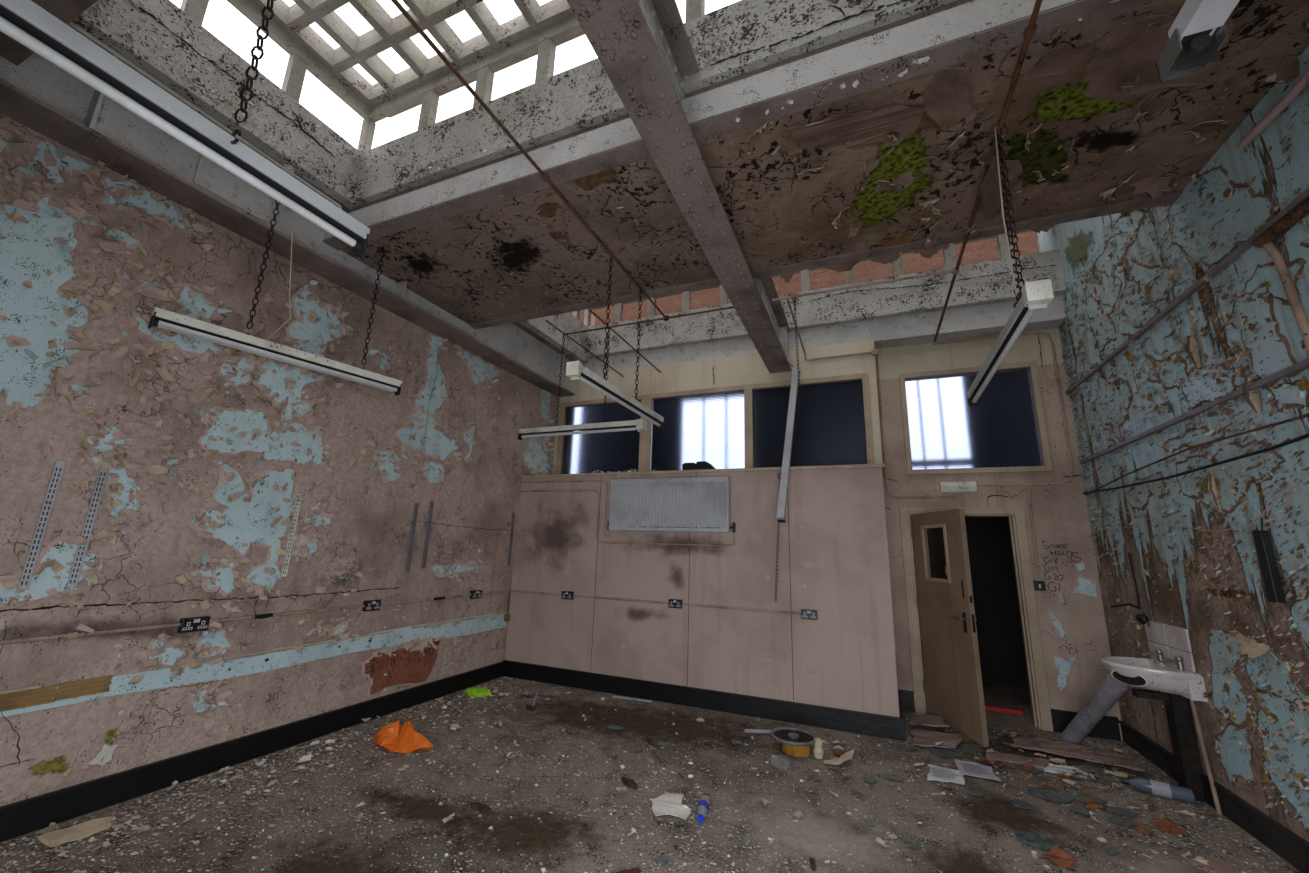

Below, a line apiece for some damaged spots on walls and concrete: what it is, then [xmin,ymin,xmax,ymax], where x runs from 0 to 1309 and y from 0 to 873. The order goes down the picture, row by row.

peeling [741,99,926,197]
water stain [1067,128,1140,153]
peeling [0,111,555,746]
peeling [797,5,1309,833]
peeling [89,744,118,766]